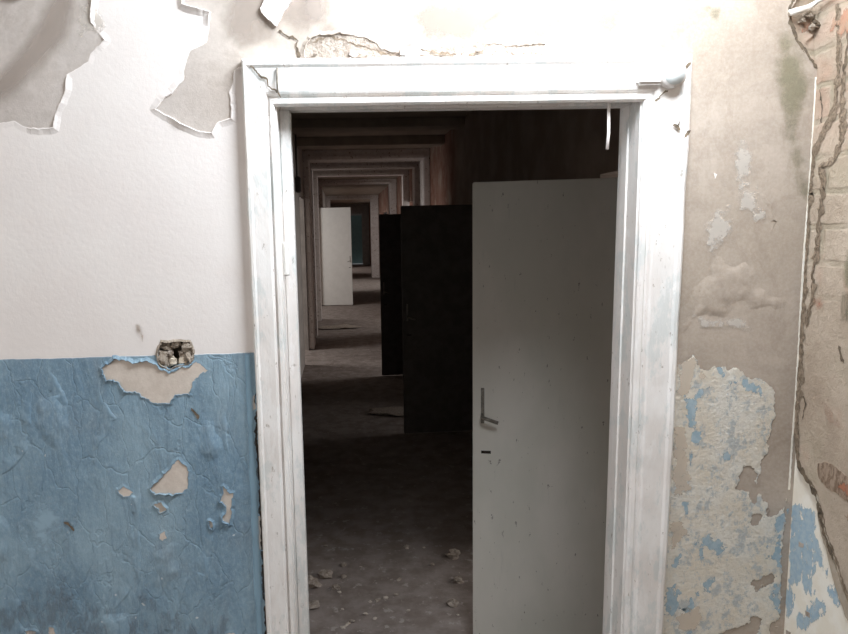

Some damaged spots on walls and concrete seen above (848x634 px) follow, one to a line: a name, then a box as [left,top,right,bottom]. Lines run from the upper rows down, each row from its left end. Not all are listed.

water stain [0,0,68,94]
peeling [0,0,111,135]
water stain [81,5,103,30]
peeling [149,0,292,139]
water stain [232,0,269,35]
crack [279,30,301,58]
crack [794,4,848,461]
peeling [663,0,848,634]
peeling [98,339,211,407]
peeling [147,457,192,515]